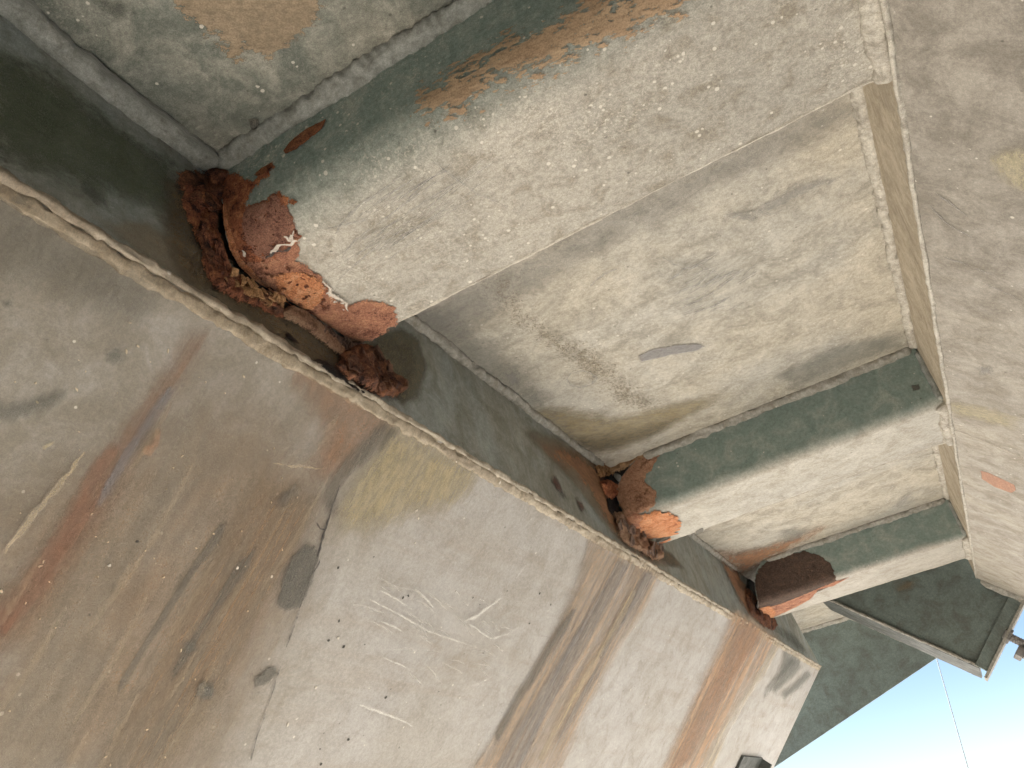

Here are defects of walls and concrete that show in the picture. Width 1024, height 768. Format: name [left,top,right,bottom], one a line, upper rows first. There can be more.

peeling [174,0,324,64]
peeling [410,0,690,128]
corrosion [283,119,326,153]
corrosion [175,162,398,355]
water stain [484,272,704,449]
corrosion [981,471,1016,493]
water stain [0,421,473,768]
corrosion [479,435,682,768]
corrosion [715,531,849,630]